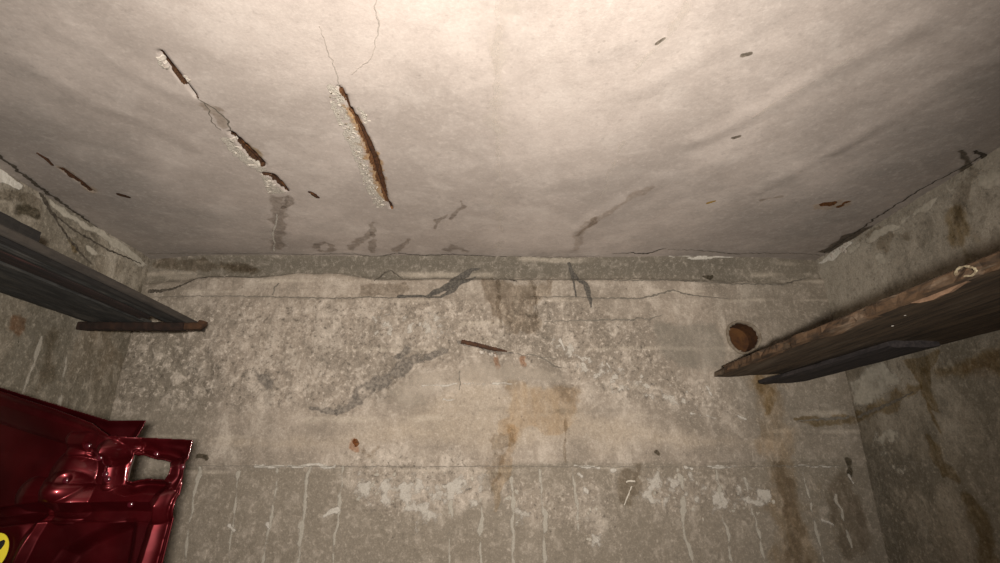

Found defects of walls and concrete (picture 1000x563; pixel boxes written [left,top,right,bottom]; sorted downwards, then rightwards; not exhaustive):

spalling [156,50,199,98]
crack [319,0,380,86]
spalling [221,130,290,194]
spalling [327,84,394,209]
crack [0,150,987,322]